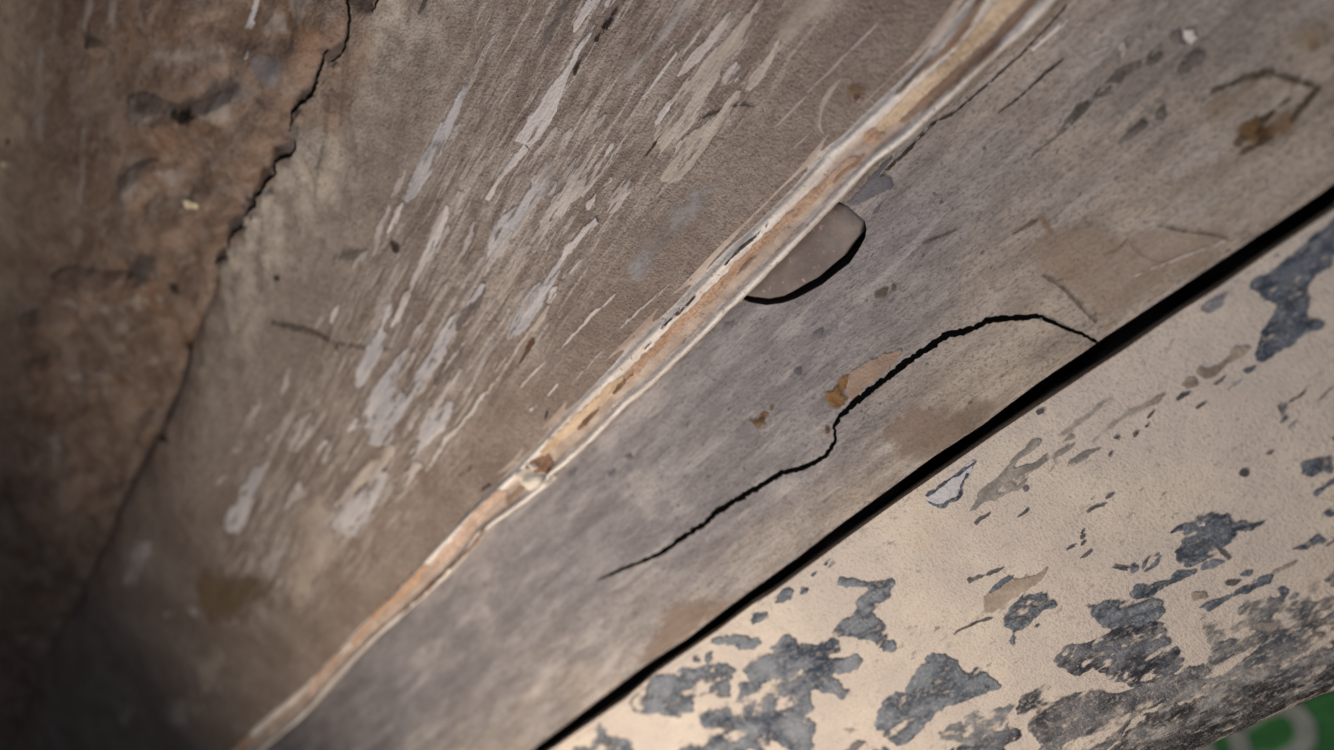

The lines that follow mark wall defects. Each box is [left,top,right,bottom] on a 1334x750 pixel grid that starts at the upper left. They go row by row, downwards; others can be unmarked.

crack [214,0,379,263]
spalling [309,0,1037,695]
crack [724,225,767,266]
rust [824,375,849,409]
crack [598,276,1102,580]
peeling [925,218,1334,525]
peeling [573,724,633,750]
peeling [629,560,896,750]
peeling [874,513,1334,750]